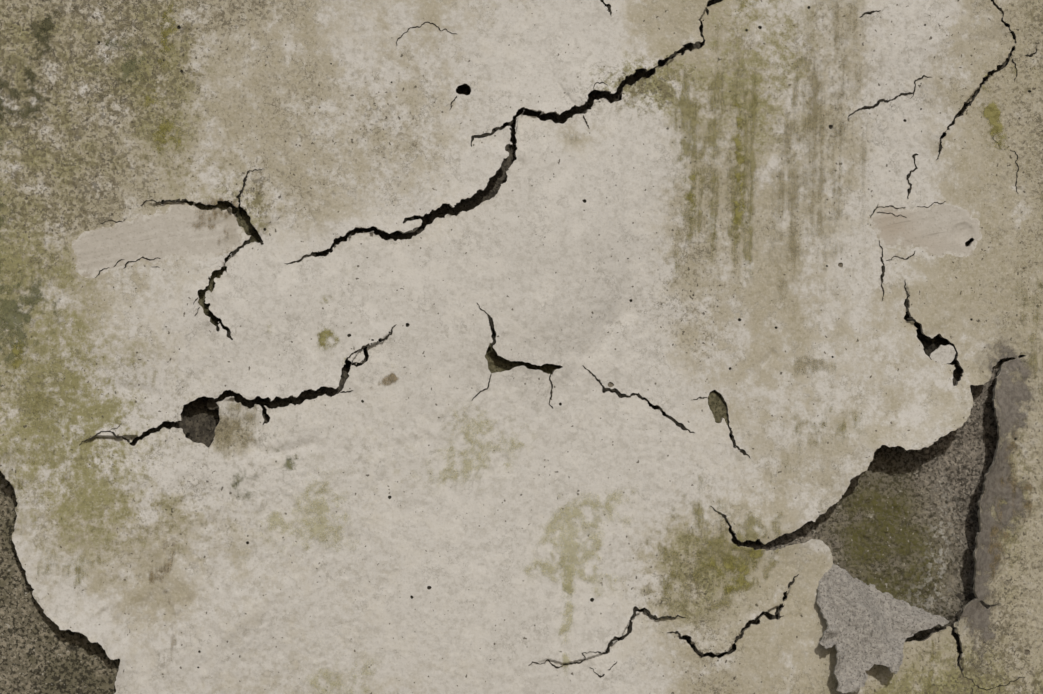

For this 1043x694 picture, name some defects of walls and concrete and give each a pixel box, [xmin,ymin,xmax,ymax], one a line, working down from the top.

crack [95,168,264,340]
crack [285,0,723,264]
damp [675,73,757,261]
crack [870,0,1037,386]
crack [79,325,396,446]
crack [582,365,695,433]
spalling [0,471,120,694]
crack [528,574,799,678]
peeling [693,327,1031,694]
crack [939,593,1025,693]